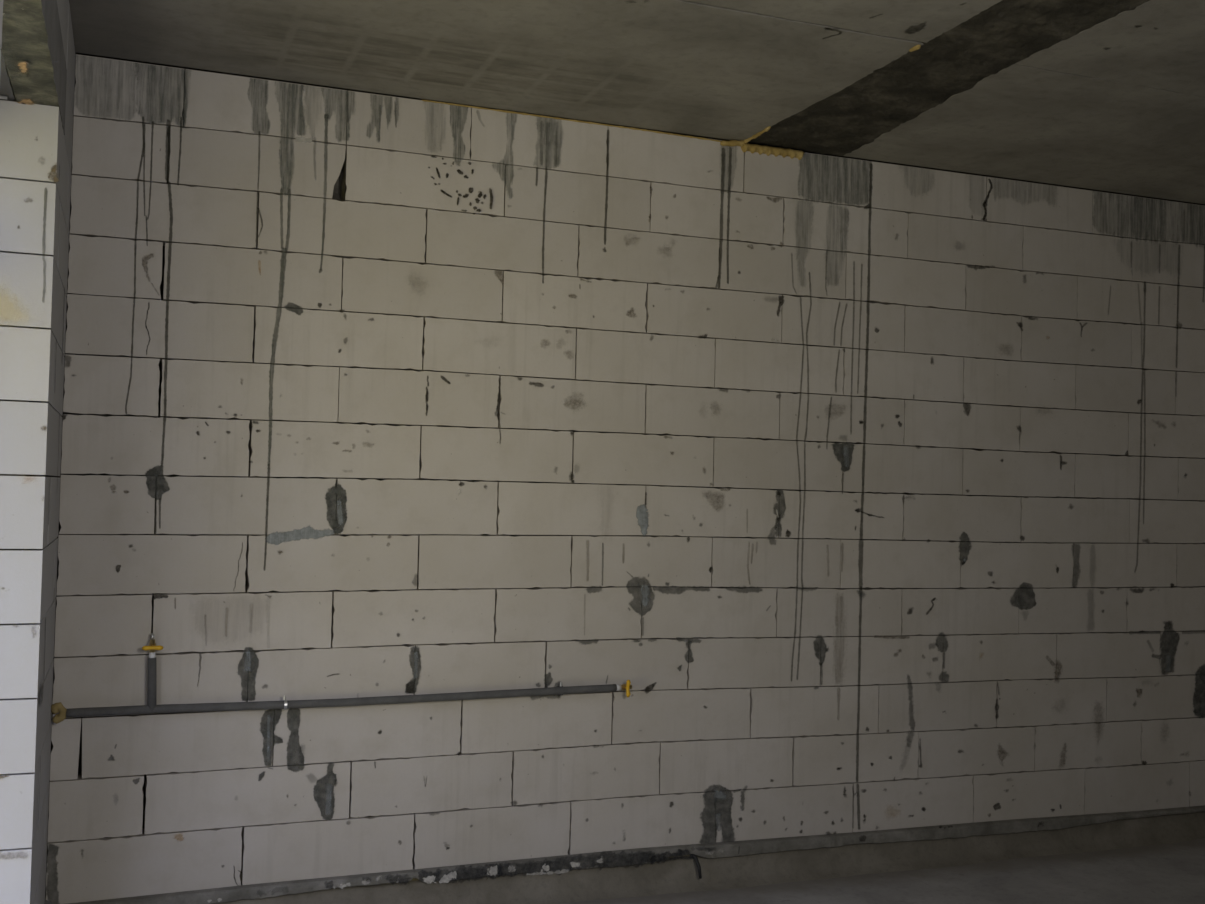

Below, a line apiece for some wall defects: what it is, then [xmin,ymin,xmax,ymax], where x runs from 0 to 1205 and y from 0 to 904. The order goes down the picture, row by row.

leakage [125,64,187,465]
leakage [536,120,562,283]
leakage [715,148,732,288]
crack [983,179,993,221]